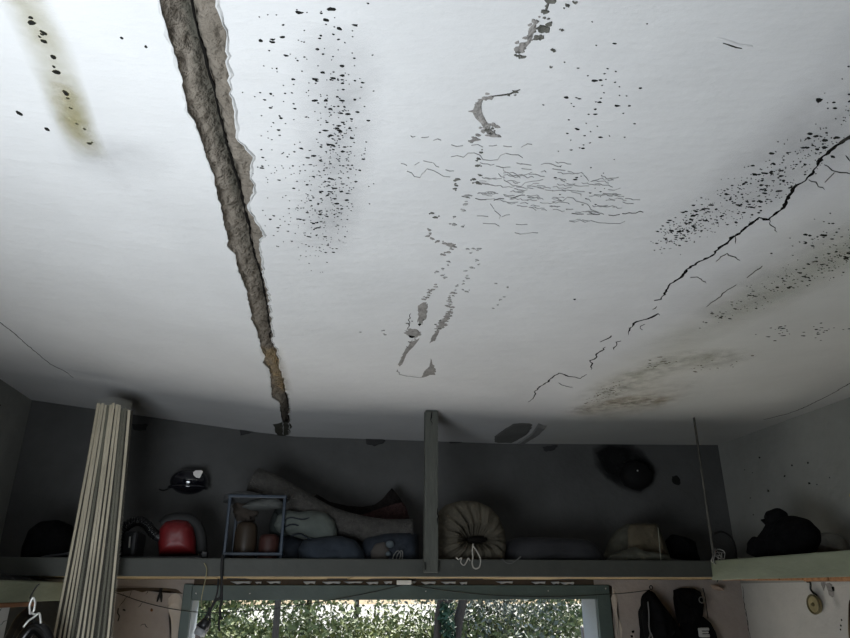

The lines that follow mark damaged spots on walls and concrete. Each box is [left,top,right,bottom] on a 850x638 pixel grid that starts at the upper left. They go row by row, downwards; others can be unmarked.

damp [27,16,47,44]
peeling [514,0,578,59]
damp [249,65,365,273]
crack [401,136,642,235]
damp [650,128,844,255]
crack [528,135,850,402]
damp [705,213,850,323]